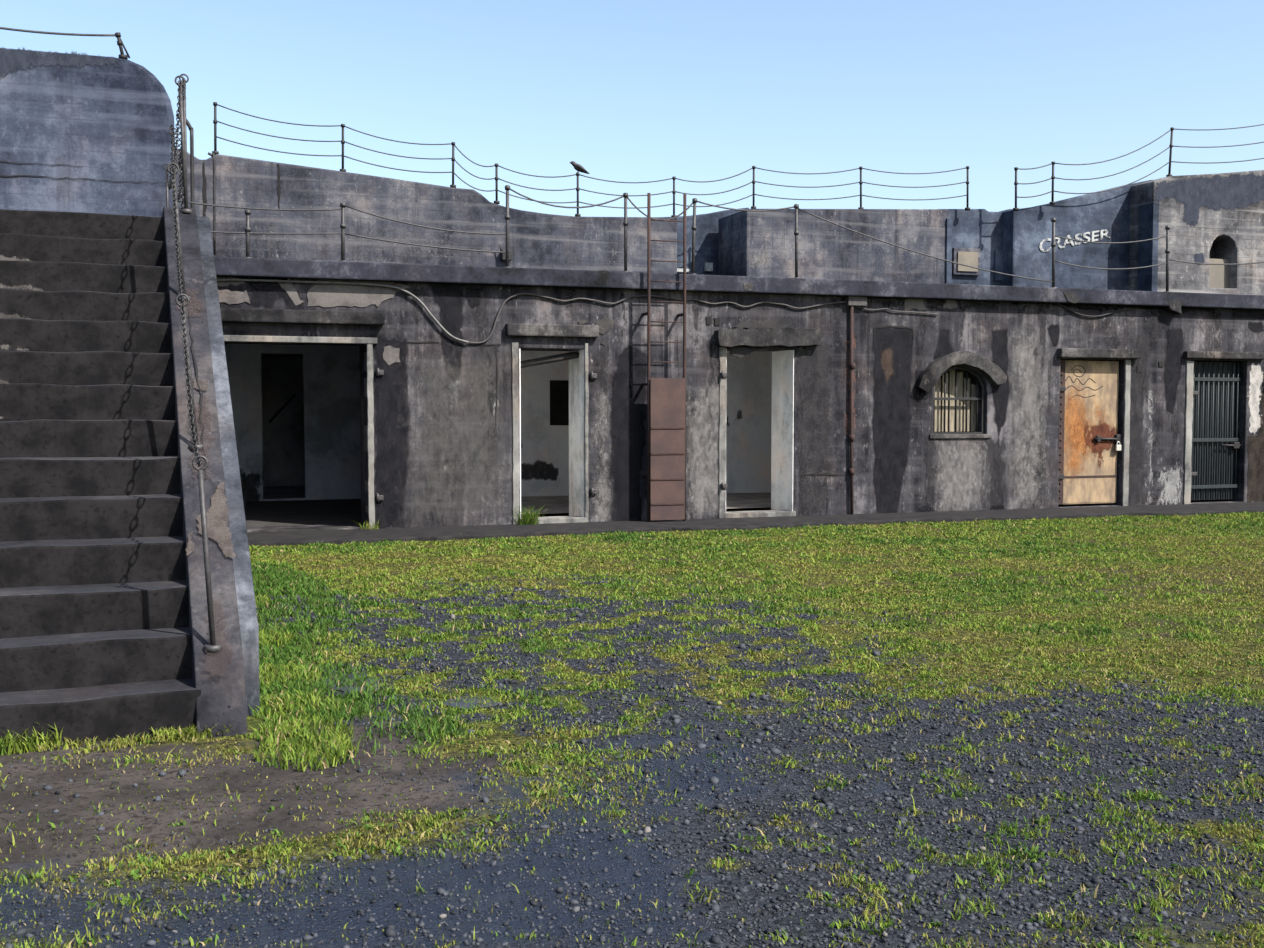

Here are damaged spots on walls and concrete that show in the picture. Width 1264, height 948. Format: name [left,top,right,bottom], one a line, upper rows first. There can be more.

peeling [0,283,43,291]
peeling [216,276,250,304]
peeling [279,278,410,307]
water stain [1181,307,1264,351]
peeling [521,460,559,481]
water stain [597,292,647,521]
corrosion [847,337,855,434]
water stain [864,297,1184,513]
corrosion [1065,398,1119,470]
peeling [1248,363,1263,436]
water stain [1247,374,1264,502]
spalling [186,482,236,558]